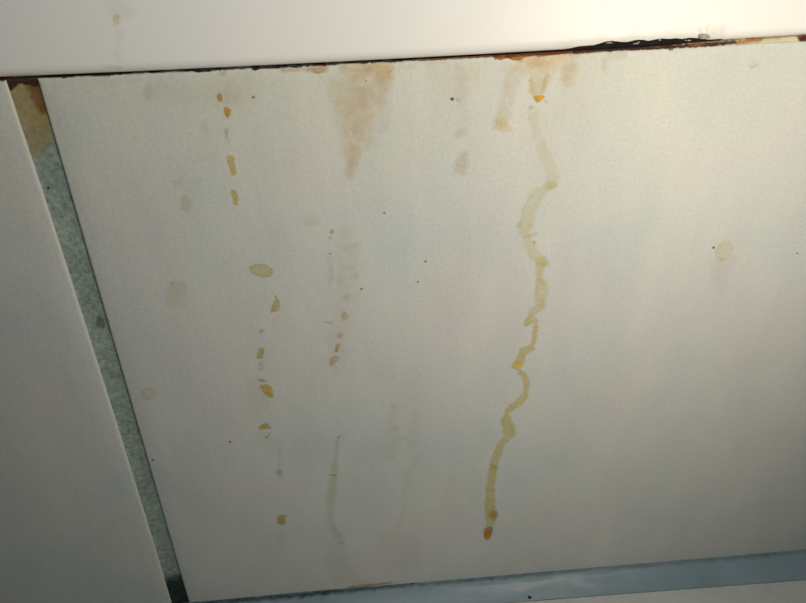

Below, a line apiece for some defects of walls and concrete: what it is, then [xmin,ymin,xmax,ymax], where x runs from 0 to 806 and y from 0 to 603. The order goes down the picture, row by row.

corrosion [179,63,348,73]
corrosion [361,34,763,77]
corrosion [0,76,52,151]
leakage [227,156,236,175]